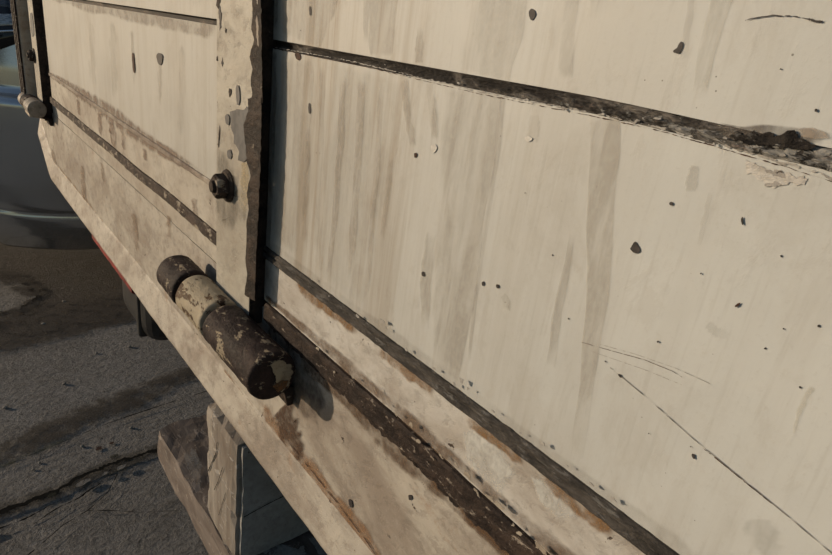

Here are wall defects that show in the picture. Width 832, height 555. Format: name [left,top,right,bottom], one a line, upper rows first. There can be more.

peeling [218,0,263,301]
spalling [729,130,817,150]
peeling [757,165,786,187]
rust [298,284,353,331]
rust [268,328,420,476]
rust [265,404,327,490]
rust [473,425,520,461]
crack [0,448,157,529]
rust [329,499,369,543]
rust [464,515,509,555]
rust [546,545,565,555]